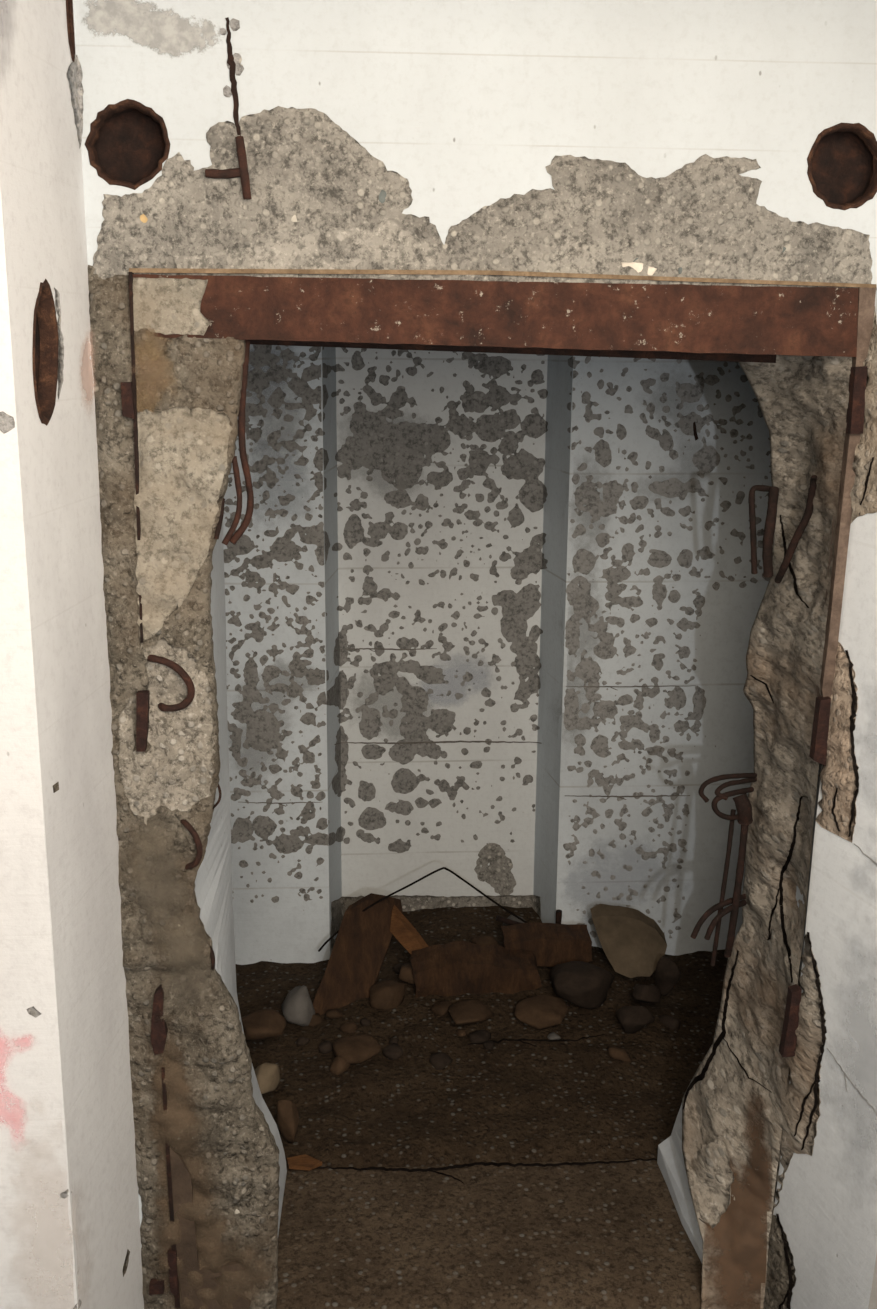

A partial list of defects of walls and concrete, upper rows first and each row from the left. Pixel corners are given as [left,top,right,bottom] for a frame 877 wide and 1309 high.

peeling [453,503,499,533]
peeling [419,547,470,585]
peeling [337,597,354,615]
peeling [462,527,548,712]
peeling [355,611,480,819]
peeling [500,750,536,785]
peeling [348,789,442,844]
spalling [563,308,877,1309]
rust [733,793,753,825]
peeling [388,821,442,853]
peeling [298,877,323,901]
peeling [331,896,364,952]